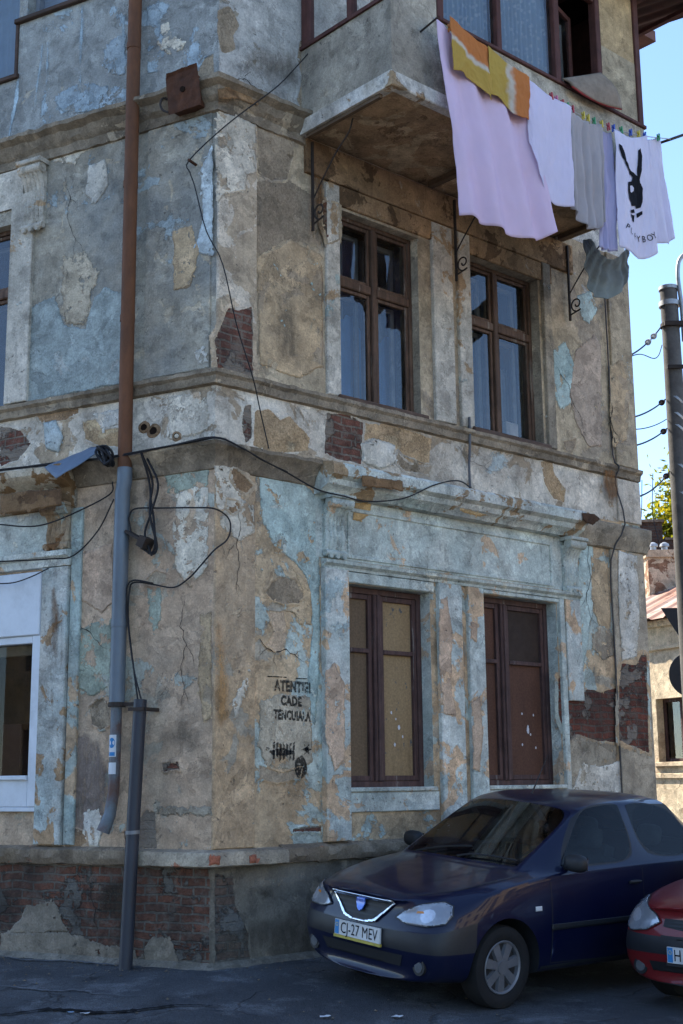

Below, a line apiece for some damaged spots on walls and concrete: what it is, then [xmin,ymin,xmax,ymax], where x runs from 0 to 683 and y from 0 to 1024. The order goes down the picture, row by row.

peeling [53,148,108,204]
peeling [172,112,342,379]
peeling [28,251,121,401]
peeling [553,291,630,447]
flaking render [0,423,33,469]
spalling [239,401,434,492]
crack [175,602,194,703]
peeling [144,465,346,786]
flaking render [554,546,652,759]
peeling [62,809,102,847]
peeling [7,899,69,933]
peeling [141,936,179,962]